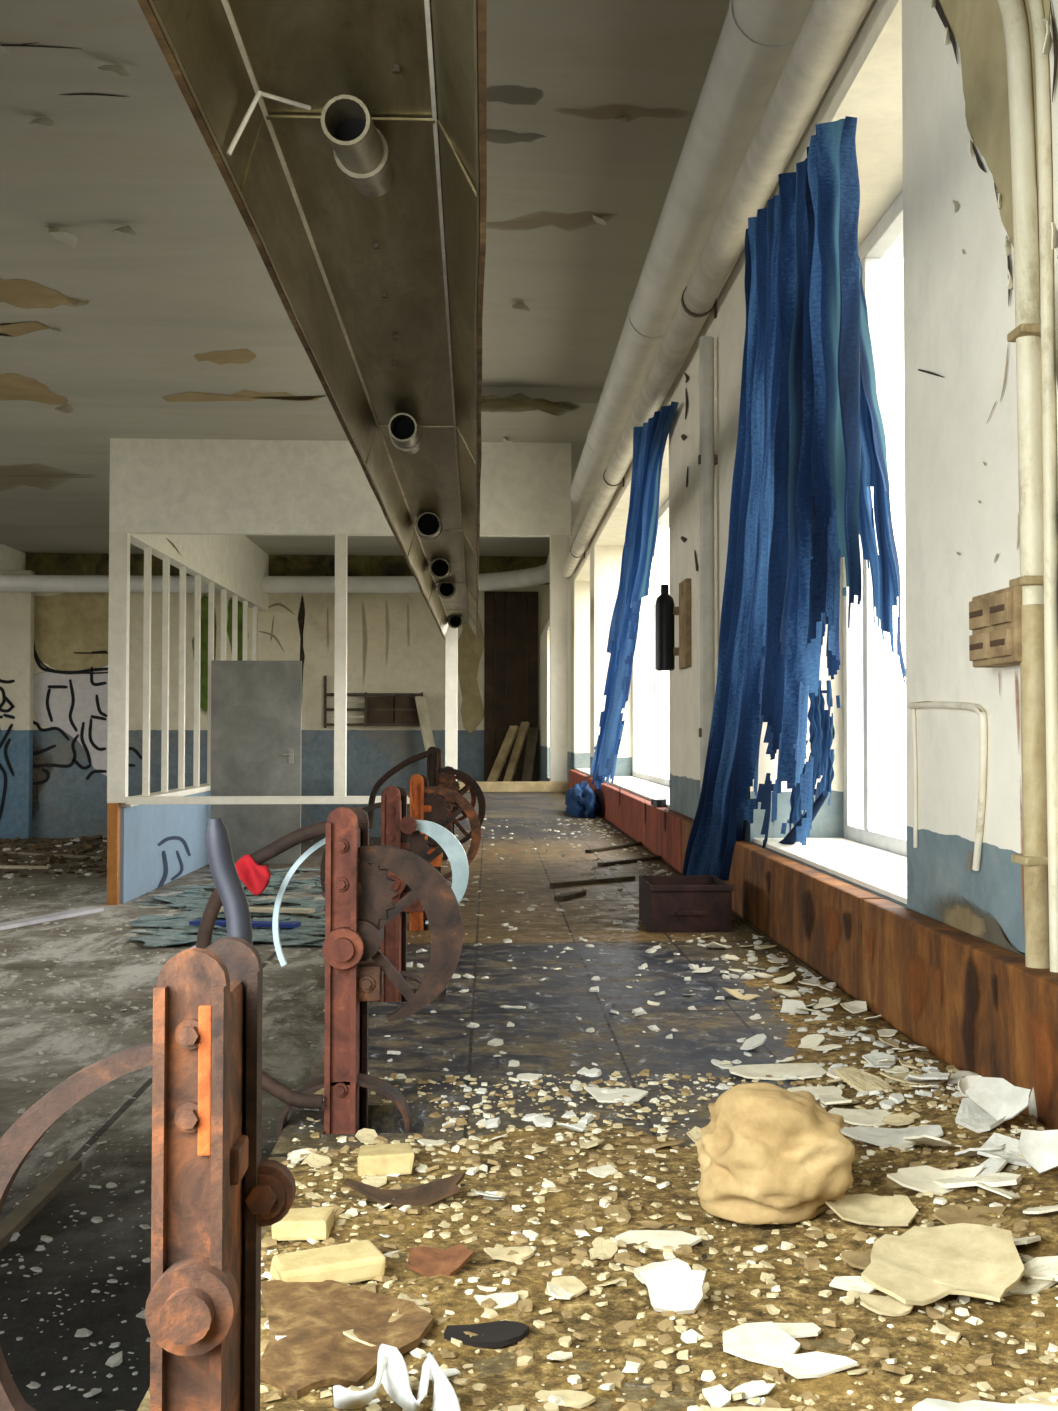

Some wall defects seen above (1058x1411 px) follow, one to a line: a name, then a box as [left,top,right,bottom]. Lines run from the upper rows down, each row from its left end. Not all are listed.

crack [0,41,82,49]
peeling [1023,0,1053,192]
peeling [931,0,1014,290]
peeling [0,278,89,337]
peeling [194,349,256,365]
peeling [0,373,73,413]
peeling [163,389,325,402]
rust [962,963,996,1071]
rust [1032,1021,1054,1113]